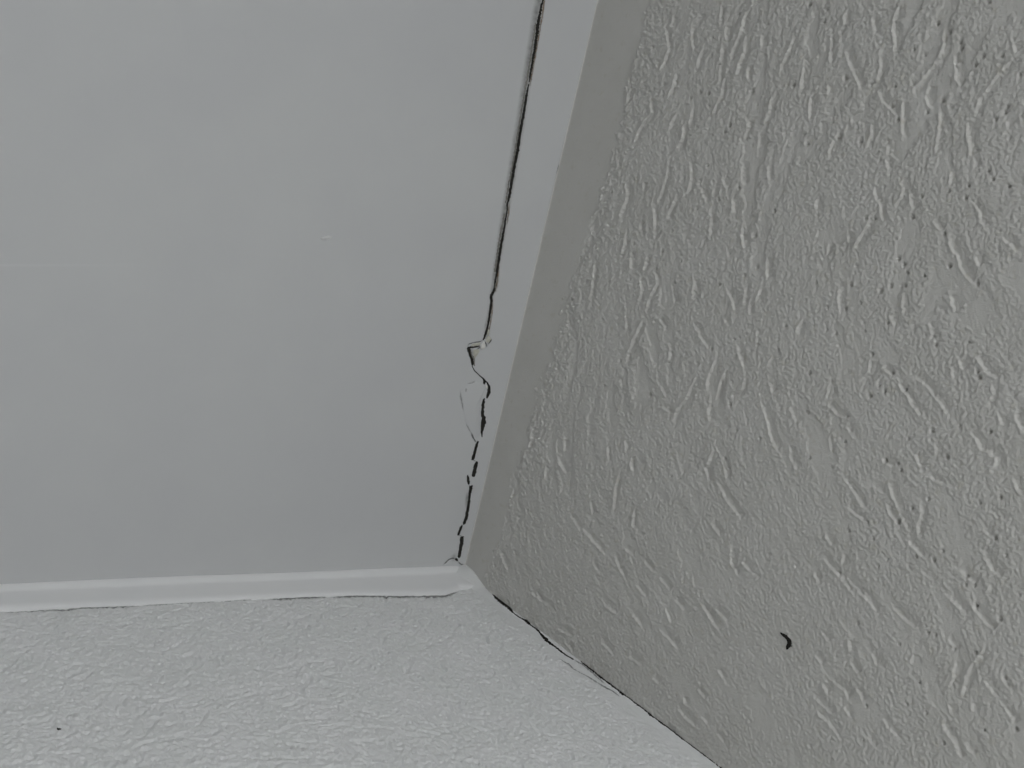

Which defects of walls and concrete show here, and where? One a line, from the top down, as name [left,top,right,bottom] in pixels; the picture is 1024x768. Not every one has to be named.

crack [445,0,545,565]
crack [492,594,722,768]